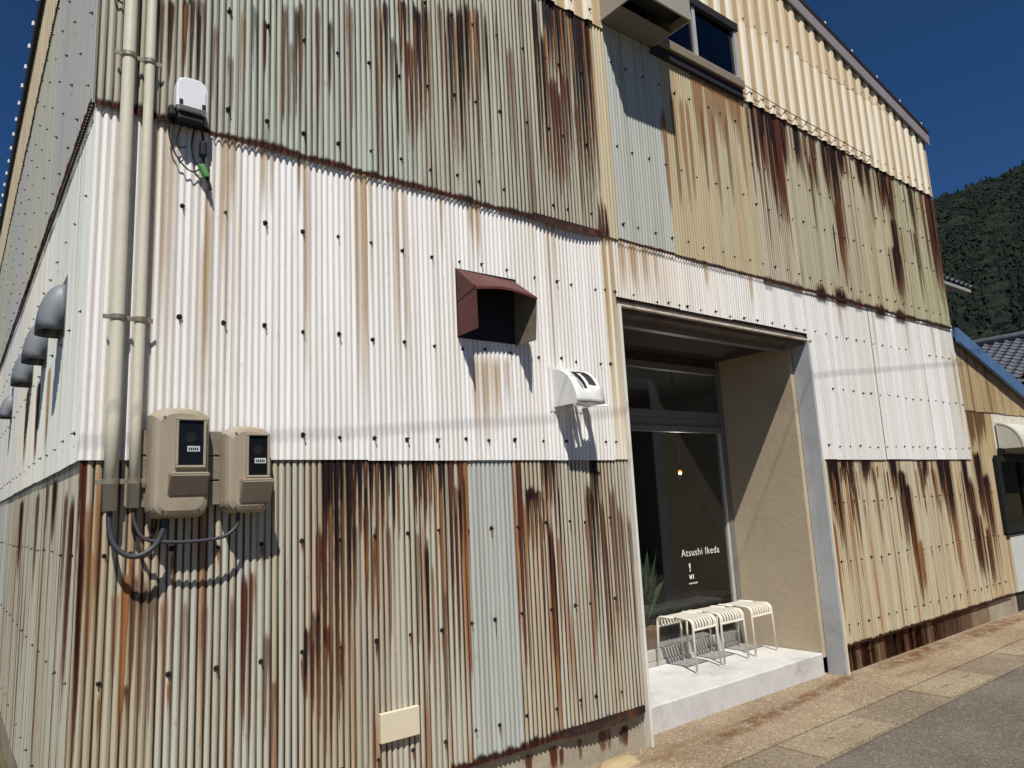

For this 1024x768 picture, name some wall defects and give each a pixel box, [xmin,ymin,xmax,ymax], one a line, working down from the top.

corrosion [167,0,201,81]
corrosion [134,103,534,219]
corrosion [380,0,431,160]
corrosion [445,4,517,166]
corrosion [532,0,600,205]
corrosion [598,101,952,329]
corrosion [17,460,92,734]
corrosion [301,460,400,761]
corrosion [513,460,572,666]
corrosion [585,460,629,656]
corrosion [826,410,1013,685]
corrosion [445,710,574,768]